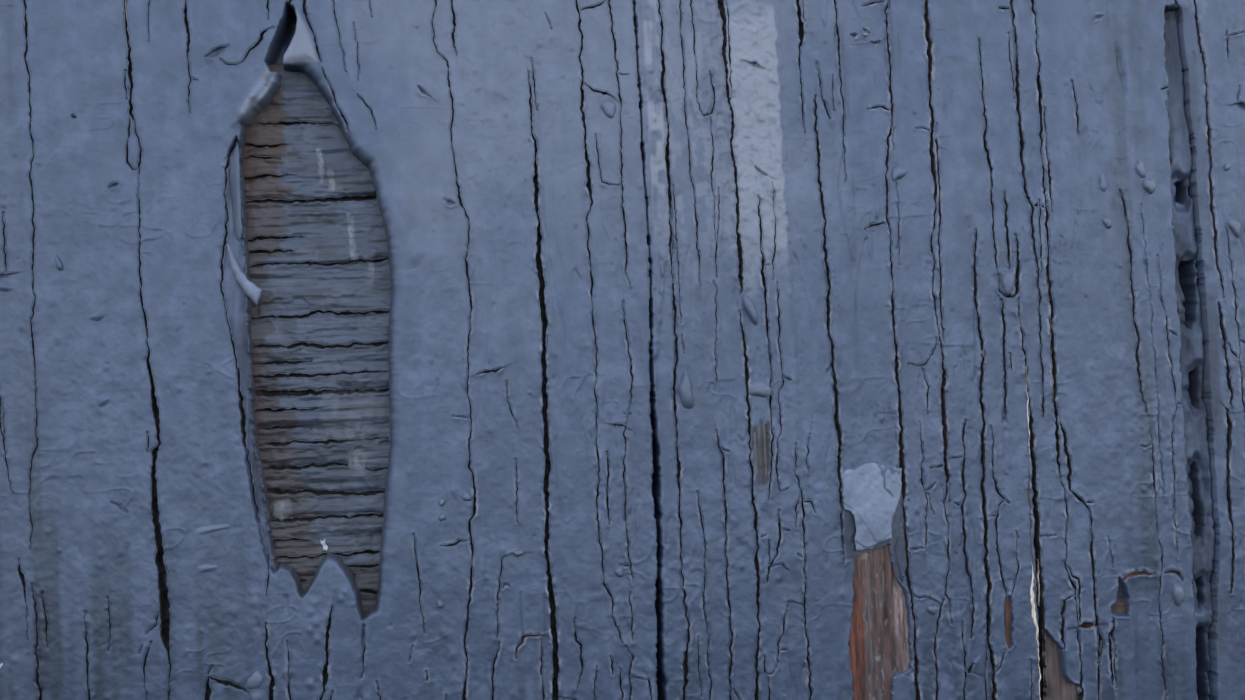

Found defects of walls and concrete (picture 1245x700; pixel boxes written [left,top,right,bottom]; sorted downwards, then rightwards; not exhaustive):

crack [0,0,50,700]
crack [83,0,172,700]
peeling [227,143,262,305]
crack [182,0,389,700]
crack [408,0,1183,700]
peeling [841,463,911,700]
peeling [1042,629,1079,700]
crack [1192,0,1245,593]